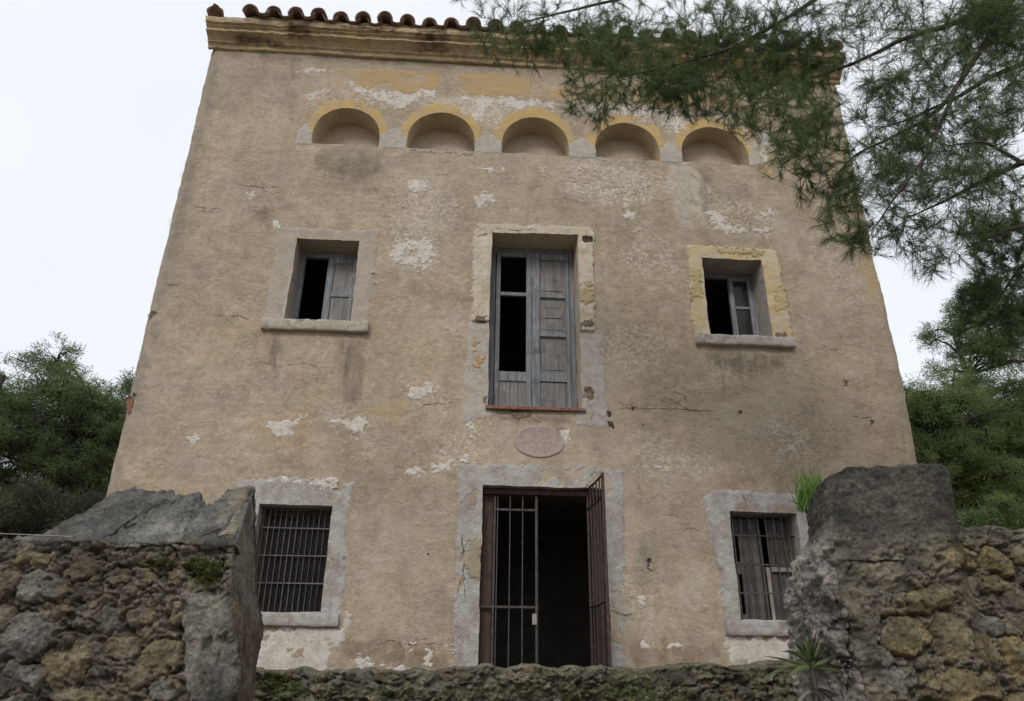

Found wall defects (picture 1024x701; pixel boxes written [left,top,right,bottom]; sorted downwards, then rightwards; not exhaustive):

peeling [348,81,438,110]
peeling [459,94,774,176]
peeling [702,207,775,258]
peeling [385,234,440,272]
peeling [407,382,440,400]
crack [589,386,717,417]
peeling [266,413,308,438]
peeling [330,414,370,440]
peeling [400,419,480,478]
peeling [269,476,339,490]
crack [457,534,477,599]
peeling [256,611,352,671]